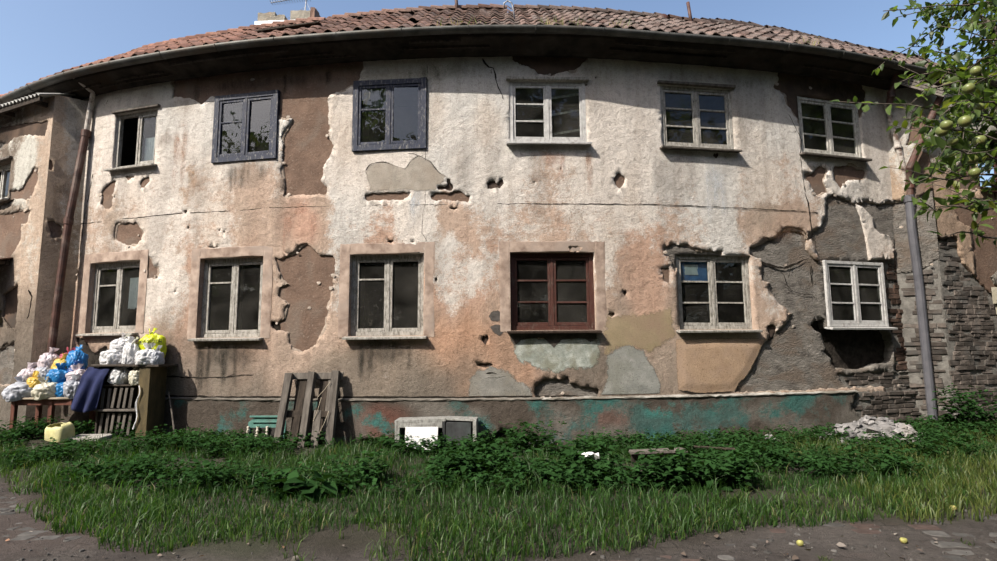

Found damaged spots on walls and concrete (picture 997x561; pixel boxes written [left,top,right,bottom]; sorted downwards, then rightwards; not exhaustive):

crack [482,58,504,100]
flaking render [773,73,866,126]
flaking render [0,121,48,150]
flaking render [171,62,364,198]
flaking render [0,159,53,261]
flaking render [98,176,150,209]
flaking render [115,220,144,248]
flaking render [365,192,410,201]
flaking render [430,179,470,210]
spalling [735,112,997,425]
flaking render [272,243,336,352]
peeling [514,338,601,398]